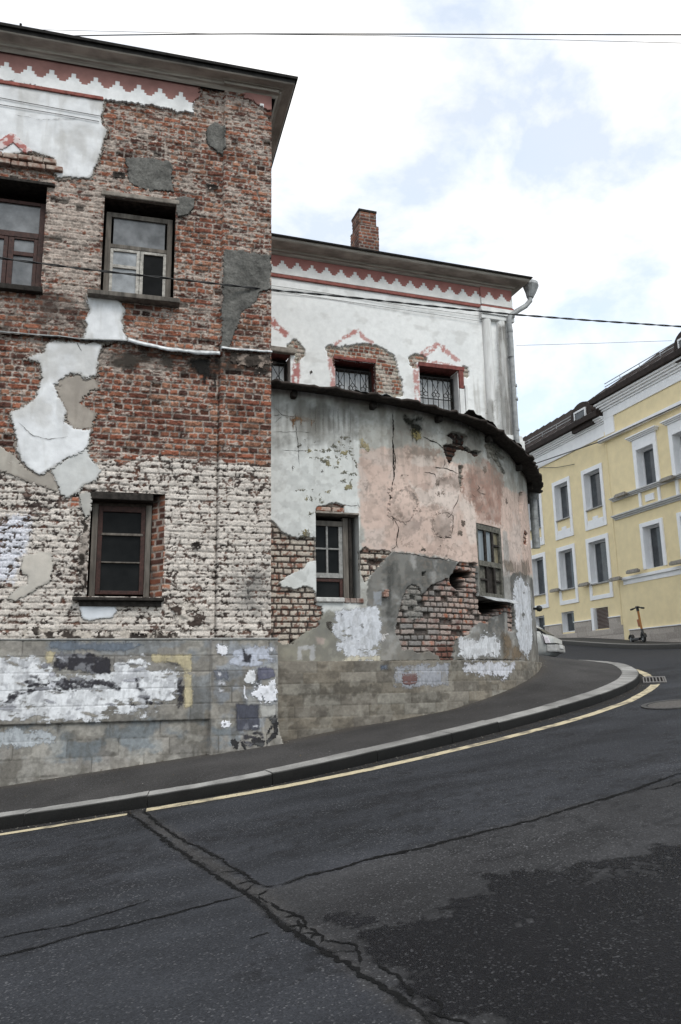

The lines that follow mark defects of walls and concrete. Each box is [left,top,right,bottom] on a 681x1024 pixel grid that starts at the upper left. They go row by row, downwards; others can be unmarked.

flaking render [0,84,109,182]
flaking render [325,344,427,397]
peeling [0,293,206,749]
crack [390,414,480,561]
flaking render [443,433,504,491]
flaking render [213,489,533,746]
crack [220,870,470,1024]
water stain [324,843,681,1024]